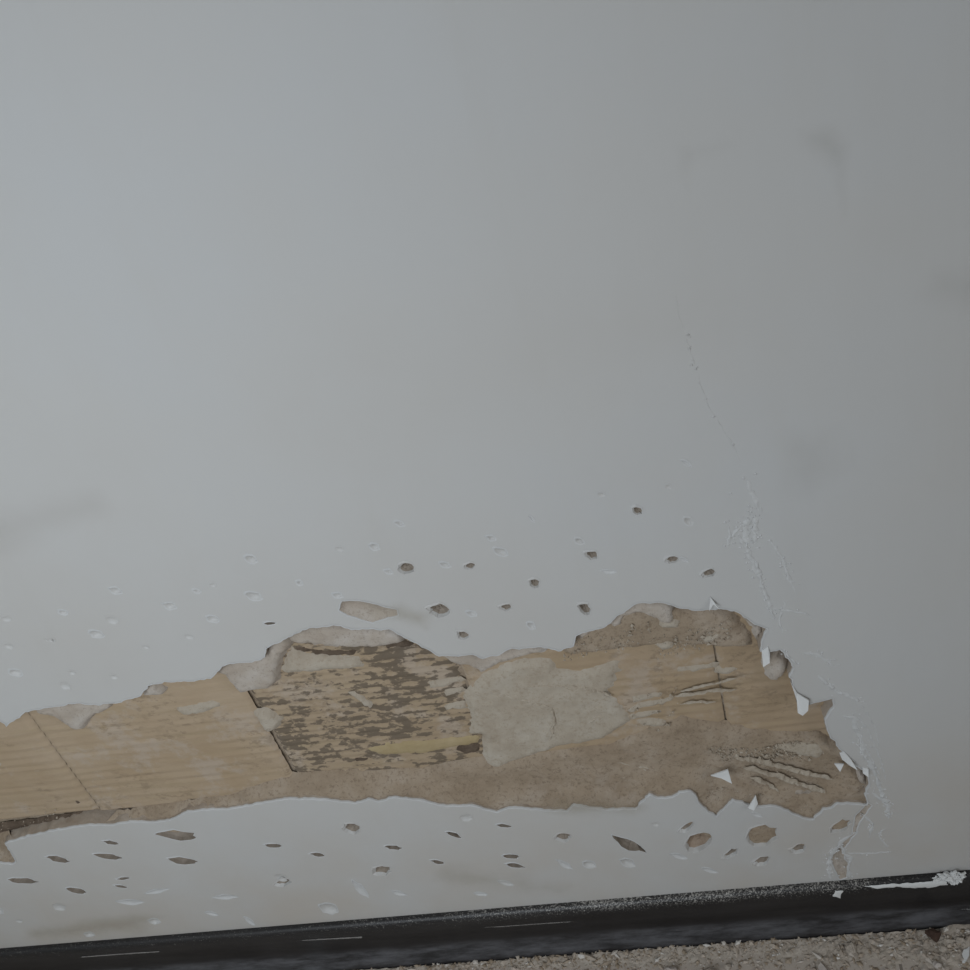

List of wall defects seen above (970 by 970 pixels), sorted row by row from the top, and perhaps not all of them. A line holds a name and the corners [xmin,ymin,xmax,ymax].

spalling [582,550,599,562]
spalling [662,554,680,565]
spalling [699,567,718,579]
spalling [527,577,541,589]
spalling [0,597,870,868]
crack [821,801,873,880]
spalling [371,865,392,877]
spalling [64,886,87,894]